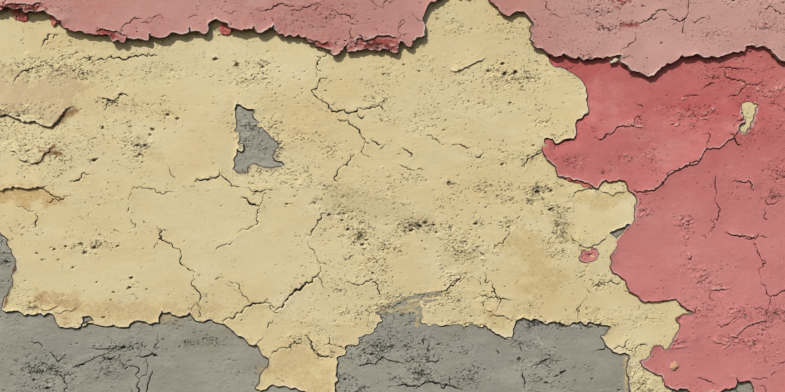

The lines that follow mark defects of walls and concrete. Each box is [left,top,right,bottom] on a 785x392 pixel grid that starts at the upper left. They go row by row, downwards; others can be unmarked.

peeling [0,0,426,56]
peeling [0,57,81,127]
flaking render [231,105,283,177]
crack [311,53,386,182]
peeling [484,7,785,251]
crack [154,227,203,322]
crack [195,171,265,249]
crack [215,213,326,328]
crack [273,336,344,357]
flaking render [0,220,768,392]
spalling [382,213,444,237]
crack [702,175,785,316]